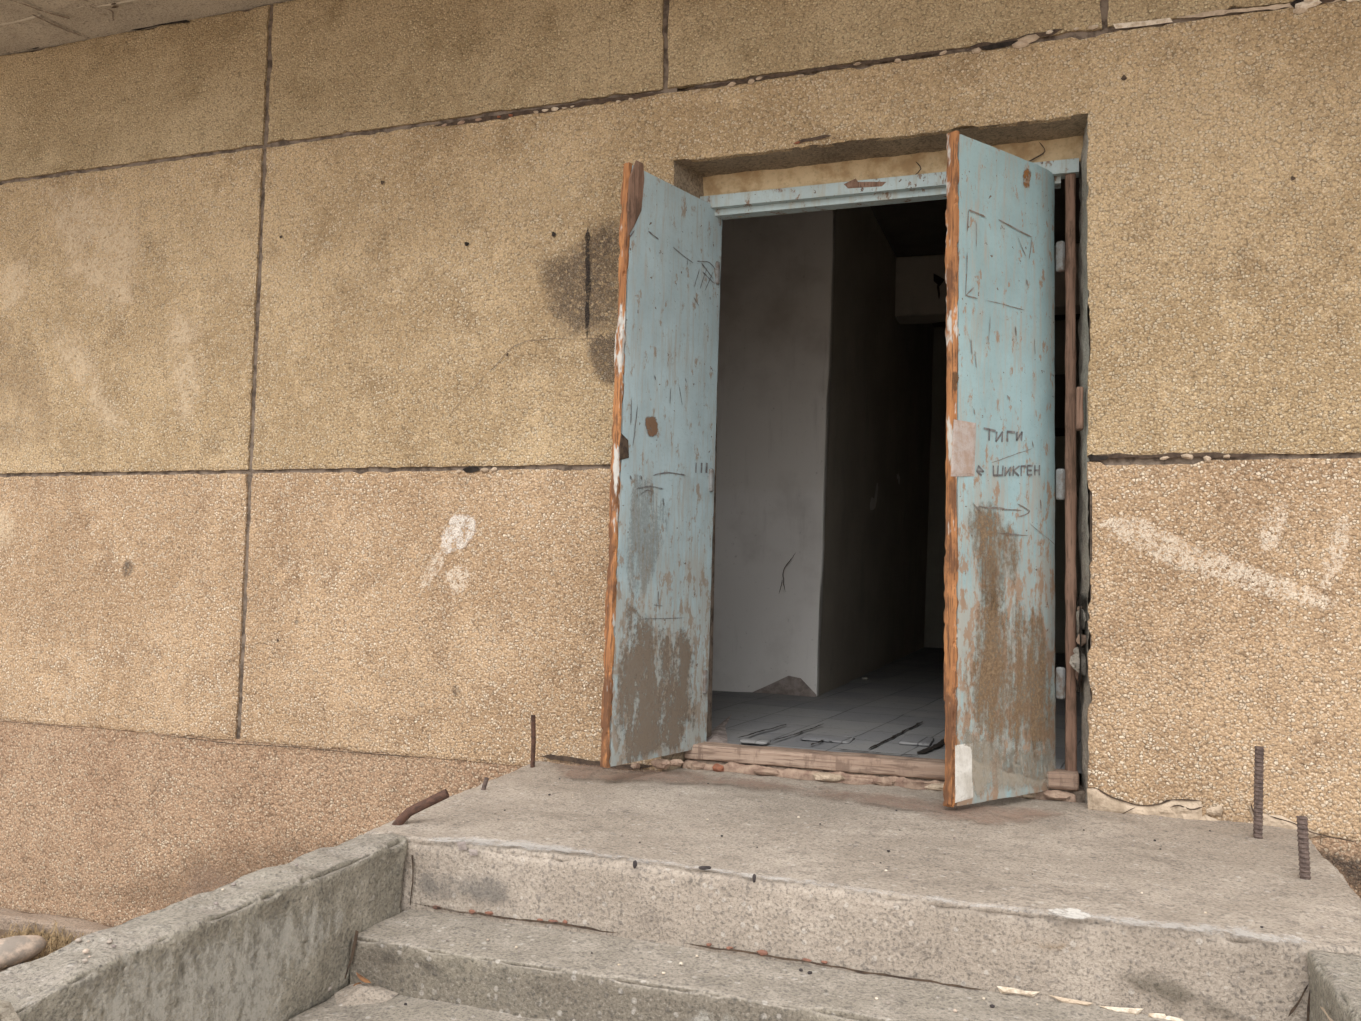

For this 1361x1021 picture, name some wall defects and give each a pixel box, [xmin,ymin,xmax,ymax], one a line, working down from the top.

peeling [1293,0,1322,14]
peeling [1012,30,1053,48]
water stain [1326,854,1361,884]